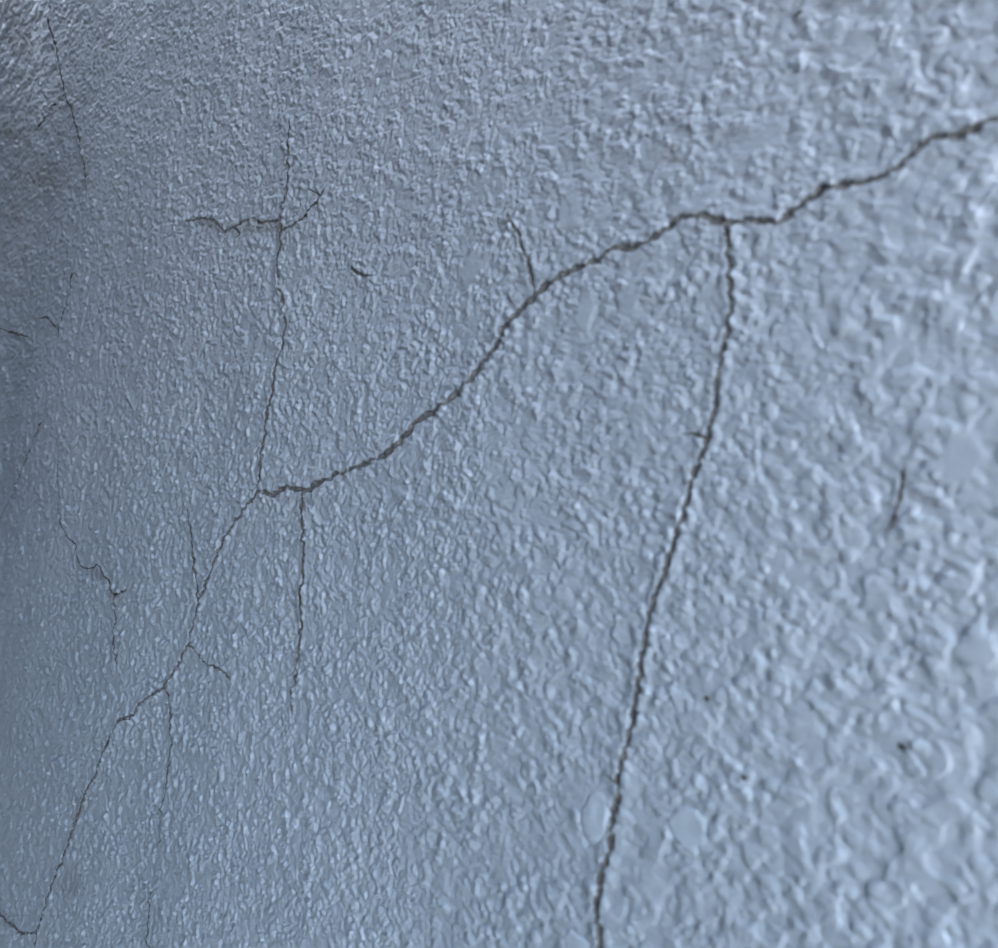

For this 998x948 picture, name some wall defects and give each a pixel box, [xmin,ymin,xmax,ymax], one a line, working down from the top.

crack [0,0,87,218]
crack [0,266,74,337]
crack [0,416,47,517]
crack [57,456,129,664]
crack [117,115,998,948]
crack [0,725,116,946]